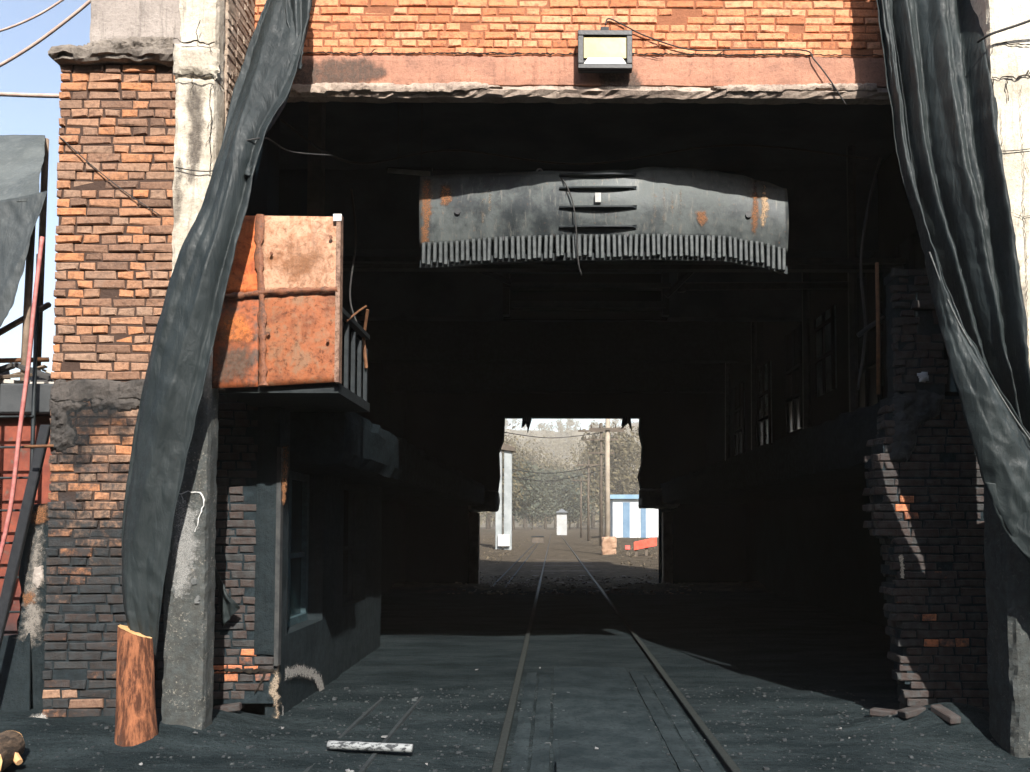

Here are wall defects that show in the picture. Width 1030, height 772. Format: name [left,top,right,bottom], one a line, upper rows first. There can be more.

crack [172,21,215,173]
damp [293,58,386,85]
rust [421,179,452,242]
rust [751,181,769,232]
crack [992,70,1030,363]